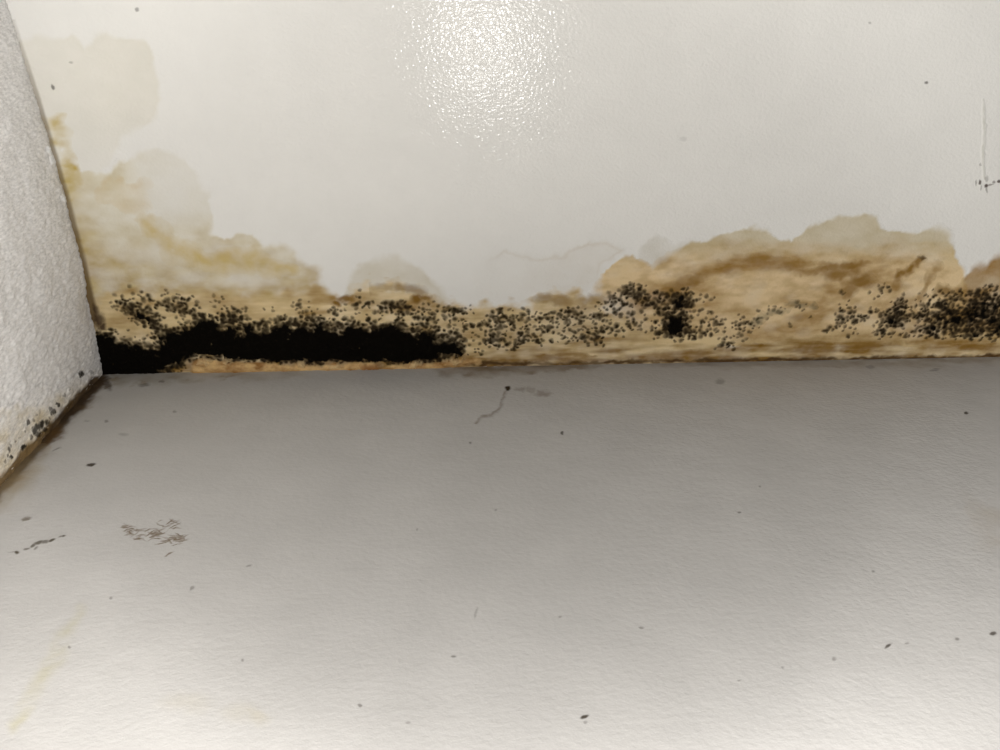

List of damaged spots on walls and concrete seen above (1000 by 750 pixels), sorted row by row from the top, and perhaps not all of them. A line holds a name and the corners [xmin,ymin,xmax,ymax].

damp [0,27,1000,486]